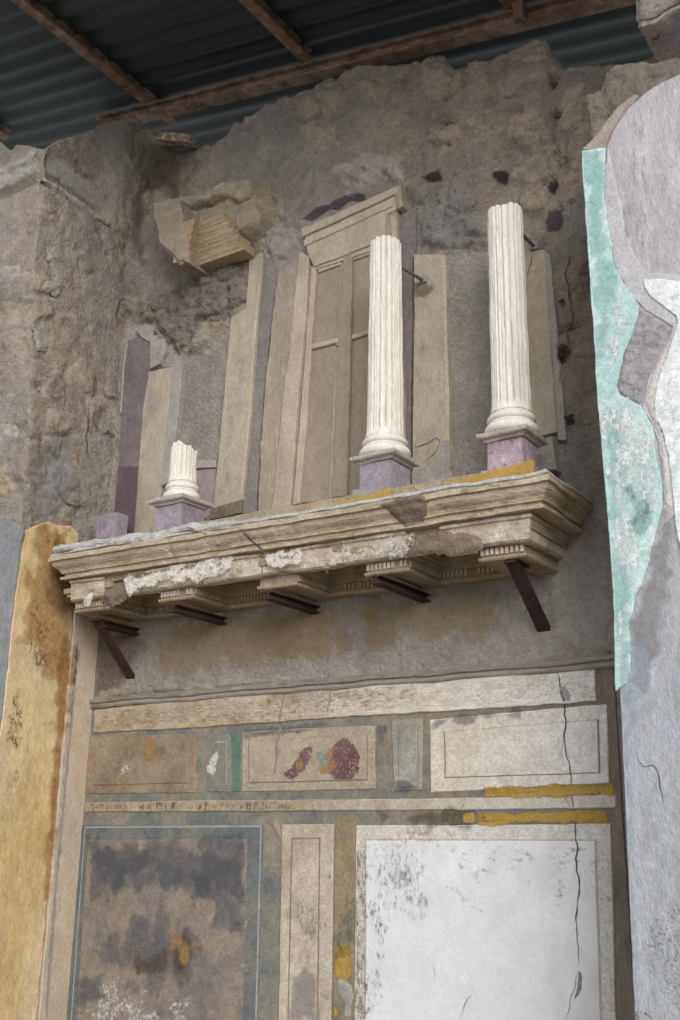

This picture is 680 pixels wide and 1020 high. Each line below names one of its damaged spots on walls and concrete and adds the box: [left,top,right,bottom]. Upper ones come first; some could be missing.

peeling [124,553,234,597]
peeling [264,548,302,568]
water stain [51,640,69,805]
crack [274,694,290,772]
crack [637,754,663,800]
crack [557,672,582,1012]